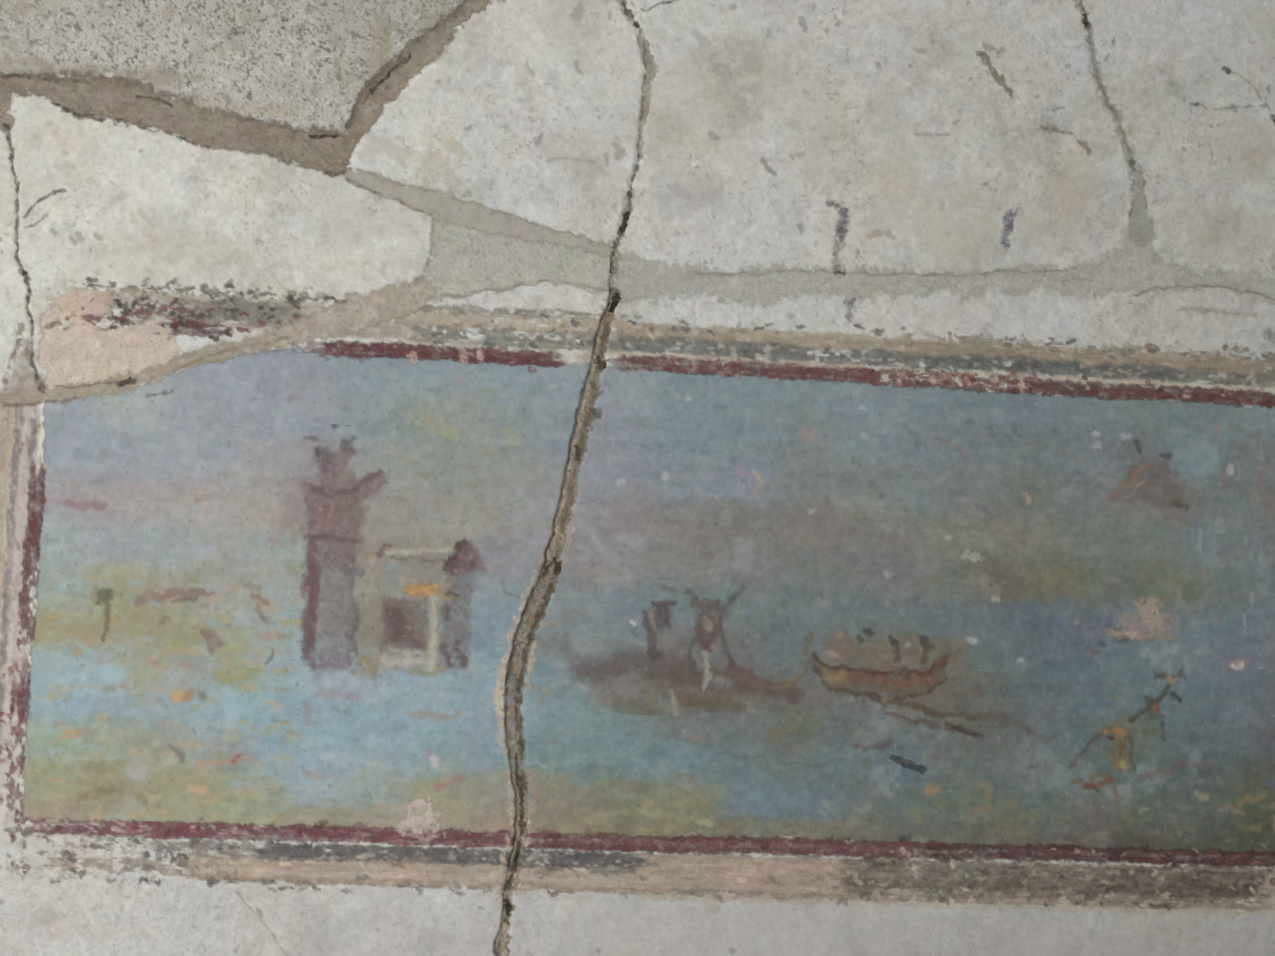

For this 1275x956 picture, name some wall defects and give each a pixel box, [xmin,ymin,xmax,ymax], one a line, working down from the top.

crack [1075,0,1154,245]
spalling [37,290,183,390]
crack [0,124,435,406]
crack [491,0,656,956]